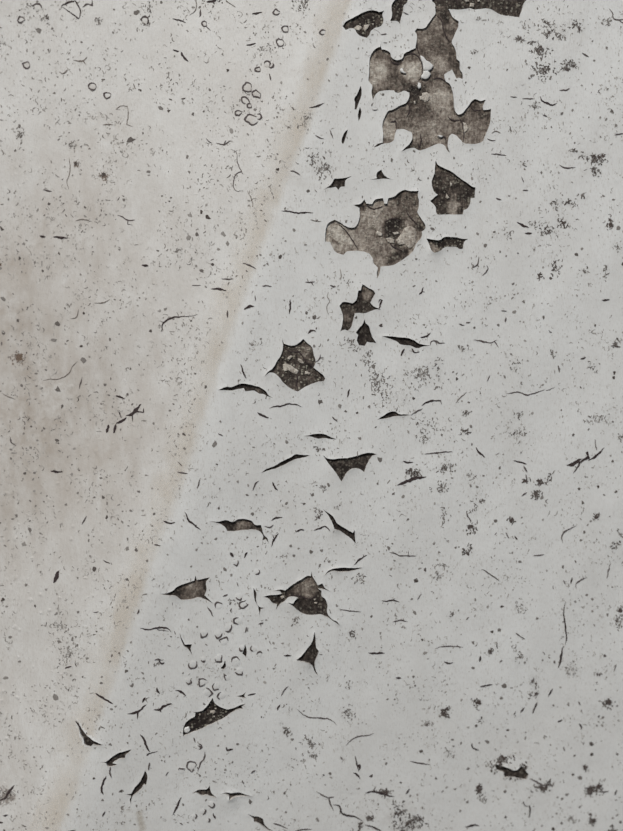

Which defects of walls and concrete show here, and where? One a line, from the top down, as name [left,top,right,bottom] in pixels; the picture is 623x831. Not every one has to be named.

peeling [343,0,408,38]
peeling [354,0,526,152]
peeling [431,161,475,215]
peeling [325,190,467,278]
peeling [340,284,431,348]
peeling [265,339,325,391]
peeling [324,453,376,481]
spalling [210,519,269,543]
peeling [162,576,212,603]
peeling [253,568,361,625]
peeling [297,632,319,674]
peeling [183,692,246,736]